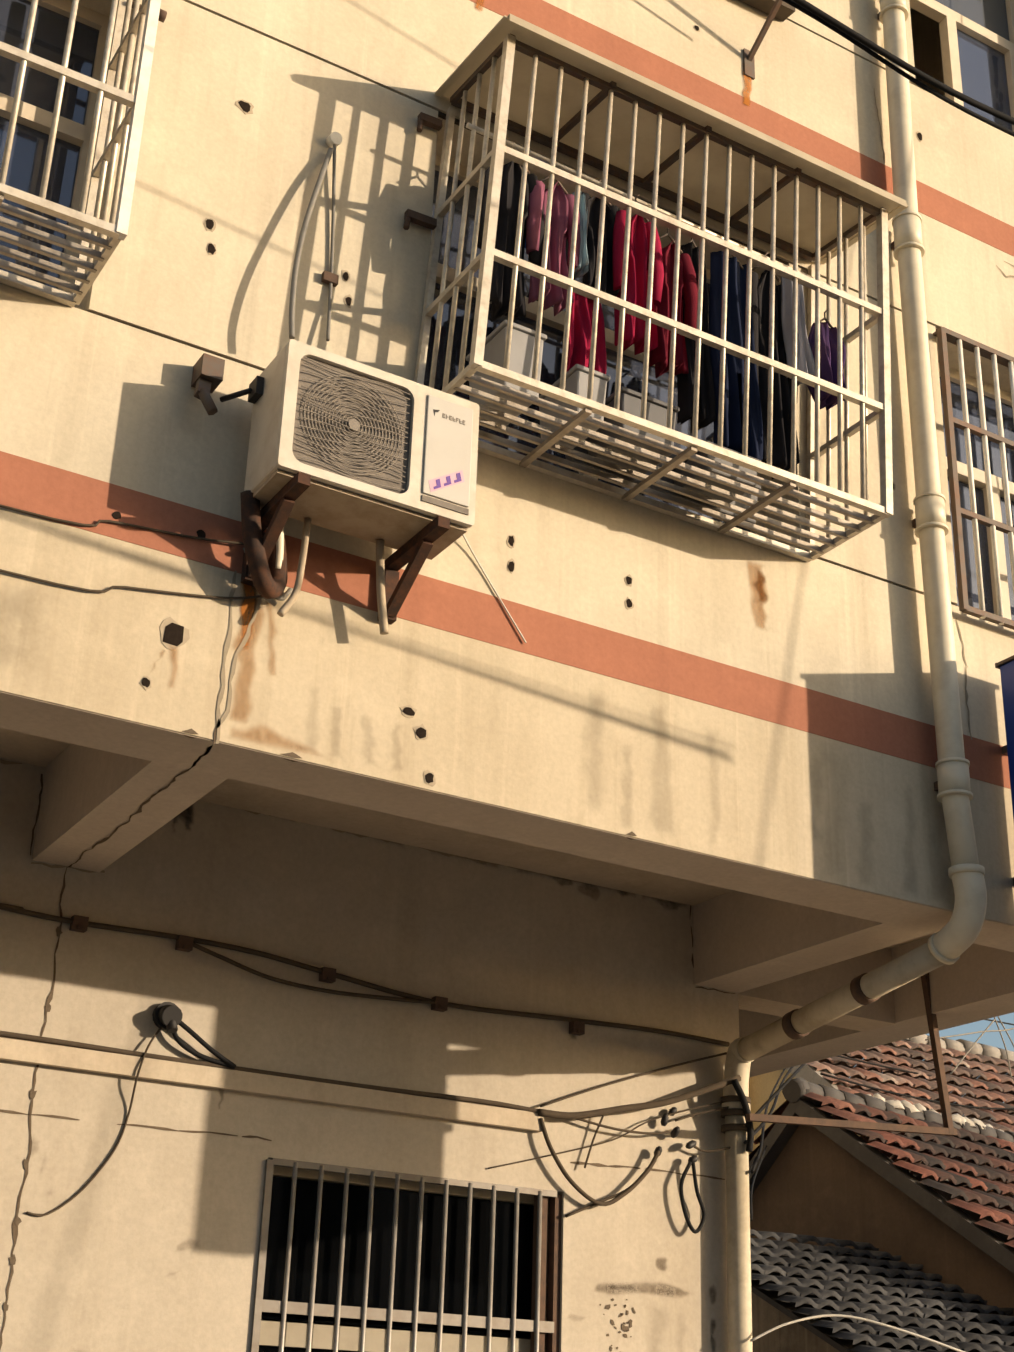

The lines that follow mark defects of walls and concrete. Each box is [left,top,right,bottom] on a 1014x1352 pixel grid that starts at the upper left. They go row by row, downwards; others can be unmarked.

crack [874,89,885,163]
corrosion [241,584,257,647]
corrosion [753,573,766,623]
crack [332,829,579,882]
crack [0,571,272,1350]
peeling [600,1298,636,1351]